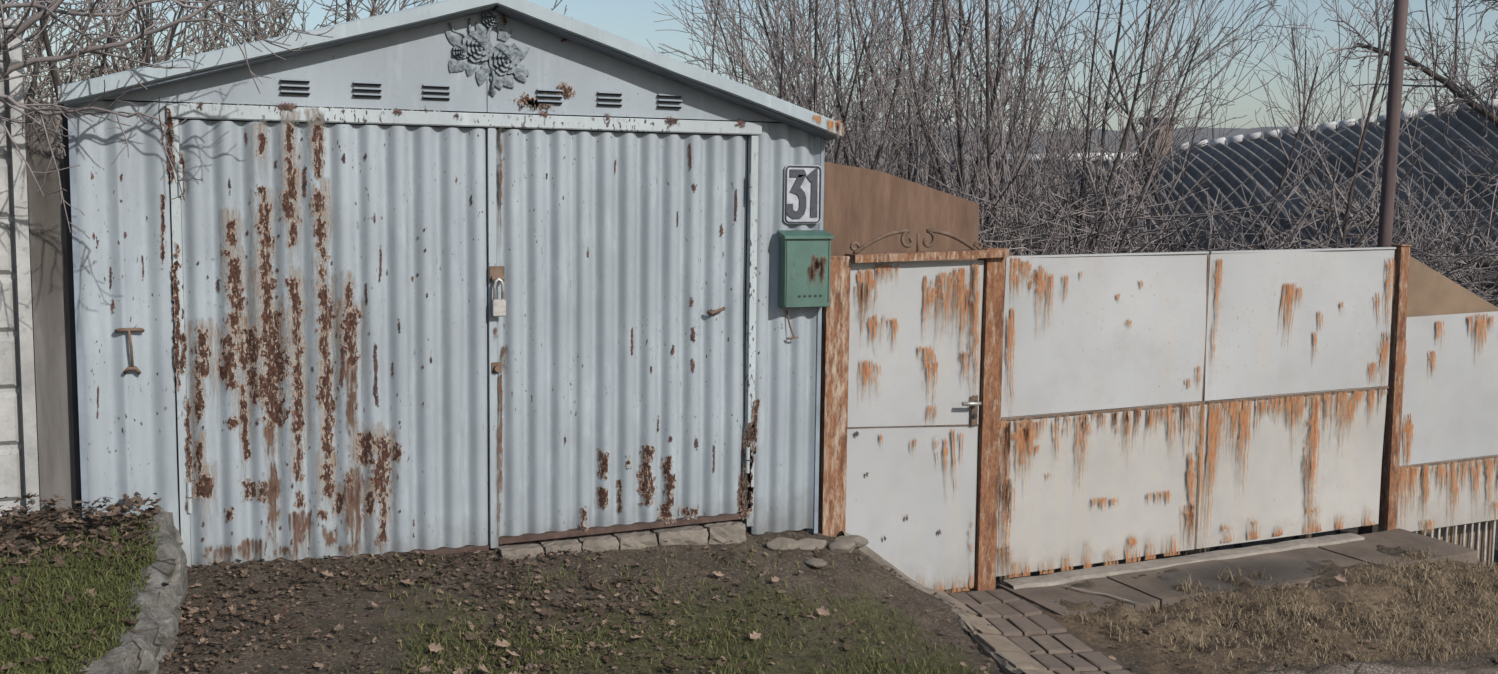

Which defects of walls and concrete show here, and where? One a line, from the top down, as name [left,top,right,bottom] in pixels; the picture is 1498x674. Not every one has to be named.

corrosion [511,81,576,111]
corrosion [160,107,402,562]
corrosion [855,264,899,390]
corrosion [919,264,980,421]
corrosion [1429,320,1445,372]
corrosion [1469,314,1494,352]
corrosion [580,445,700,531]
corrosion [737,398,761,519]
corrosion [935,428,963,482]
corrosion [999,257,1407,578]
corrosion [1398,413,1498,530]
corrosion [936,570,974,593]